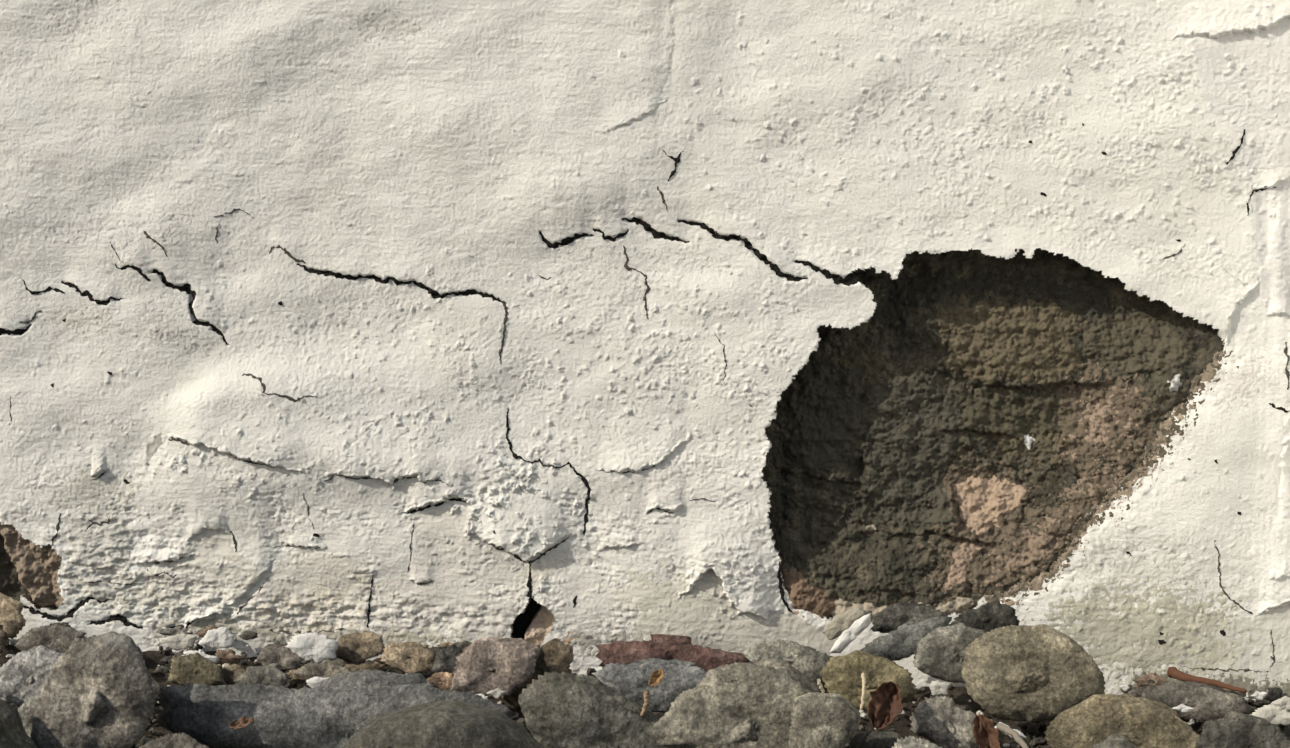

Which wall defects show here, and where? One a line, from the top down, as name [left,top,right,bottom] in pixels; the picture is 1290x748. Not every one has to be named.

peeling [600,99,667,133]
peeling [1168,12,1290,322]
crack [0,230,229,345]
crack [269,245,508,365]
crack [537,150,860,319]
crack [242,373,317,402]
crack [484,408,667,599]
spalling [0,248,1224,655]
crack [1183,540,1276,672]
peeling [1175,599,1290,689]